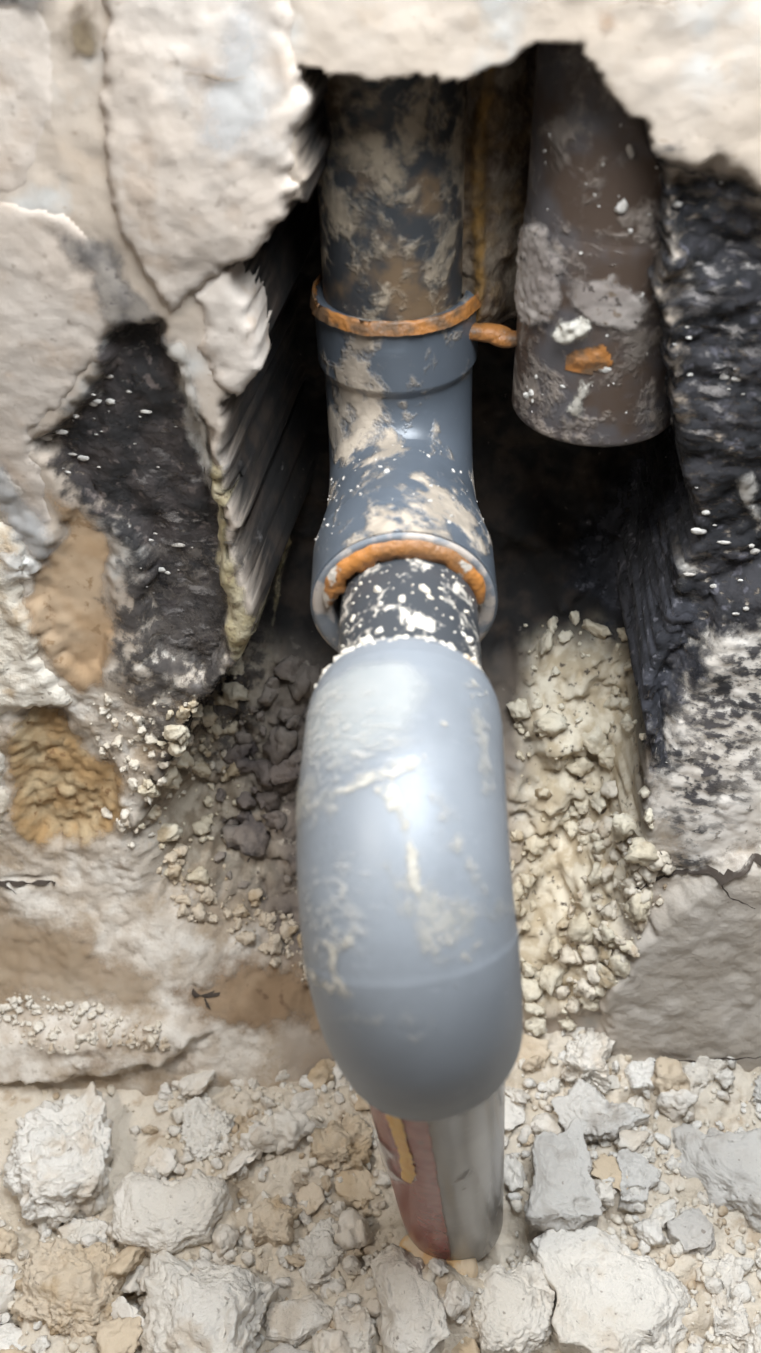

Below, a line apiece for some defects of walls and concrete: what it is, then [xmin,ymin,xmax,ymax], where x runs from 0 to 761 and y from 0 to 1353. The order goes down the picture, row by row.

water stain [0,0,40,10]
spalling [0,4,292,715]
flaking render [0,752,9,840]
crack [0,880,56,894]
crack [636,851,761,909]